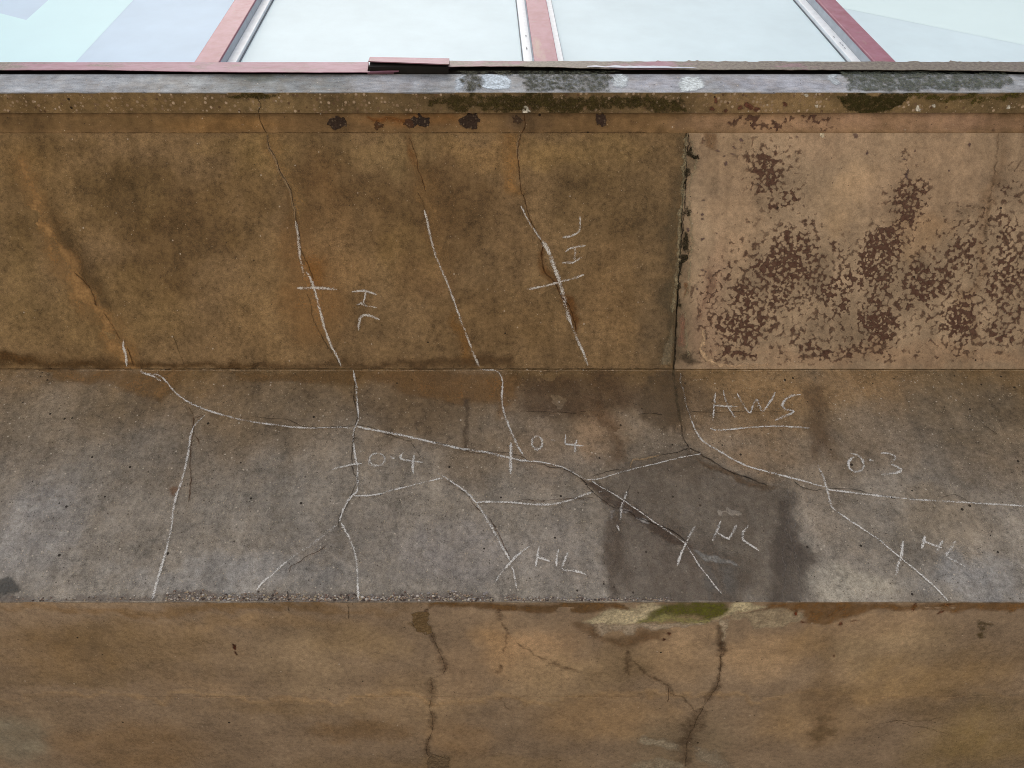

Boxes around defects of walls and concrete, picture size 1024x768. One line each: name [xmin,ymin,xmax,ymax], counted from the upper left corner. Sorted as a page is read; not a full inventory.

damp [482,74,511,89]
damp [611,74,628,88]
damp [678,76,704,92]
crack [257,98,327,345]
crack [517,114,576,328]
peeling [691,115,1024,368]
crack [260,369,766,540]
damp [430,464,917,649]
damp [935,603,1024,612]
crack [654,642,726,746]